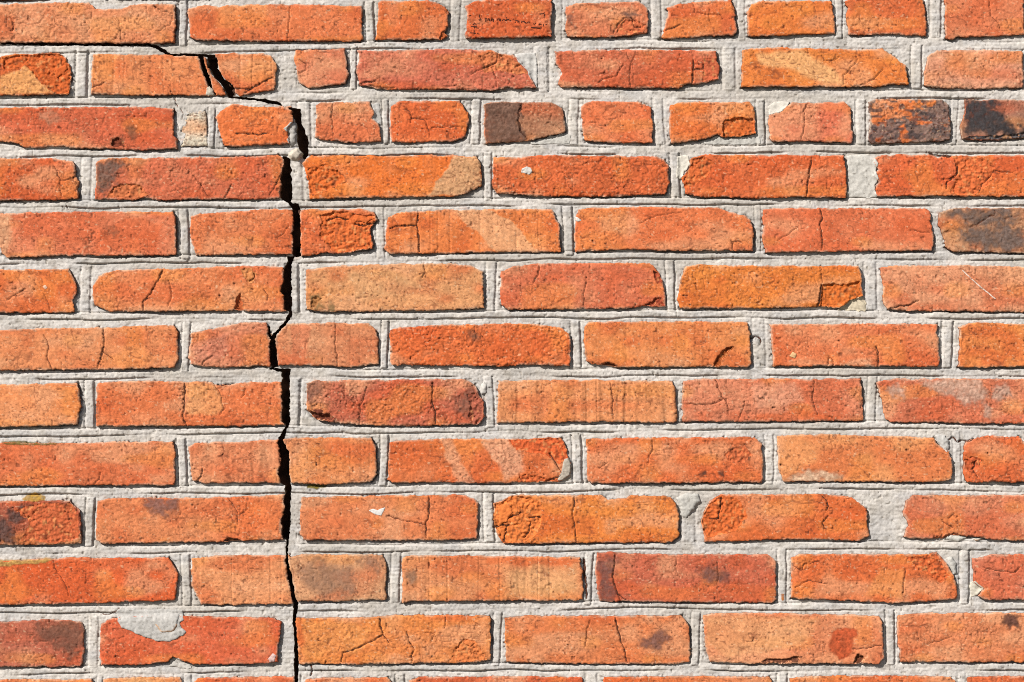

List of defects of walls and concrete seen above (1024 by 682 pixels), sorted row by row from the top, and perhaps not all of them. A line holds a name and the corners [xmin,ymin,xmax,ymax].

crack [2,6,312,682]